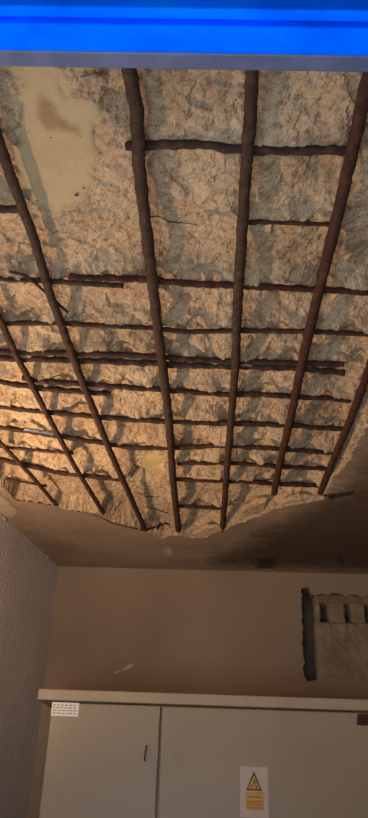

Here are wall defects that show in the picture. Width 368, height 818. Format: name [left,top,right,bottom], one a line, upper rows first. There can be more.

spalling [0,66,368,538]